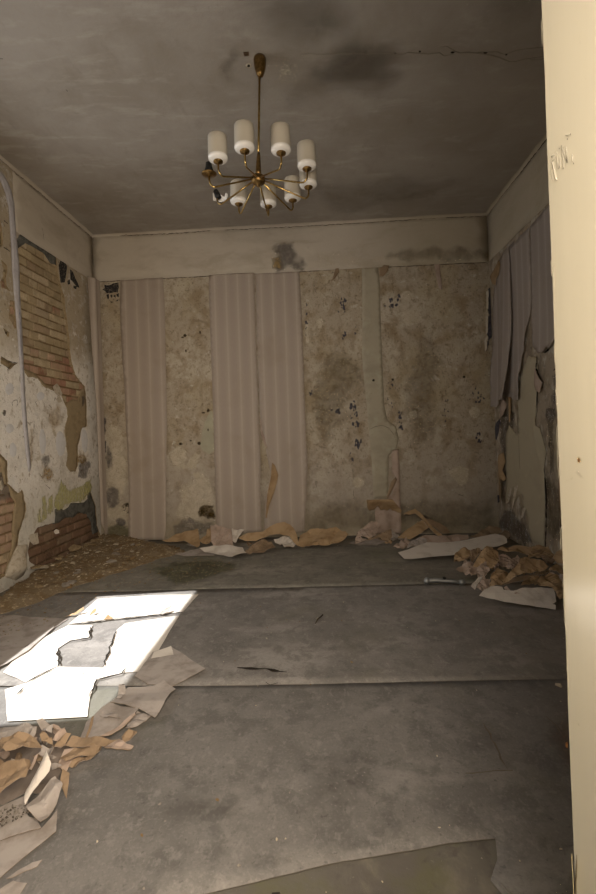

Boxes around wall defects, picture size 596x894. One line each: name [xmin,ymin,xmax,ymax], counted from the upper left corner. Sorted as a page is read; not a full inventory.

crack [122,139,547,236]
flaking render [1,235,86,472]
peeling [103,283,119,303]
damp [274,245,303,270]
peeling [484,288,492,351]
flaking render [0,455,99,576]
flaking render [170,440,216,528]
peeling [495,356,559,546]